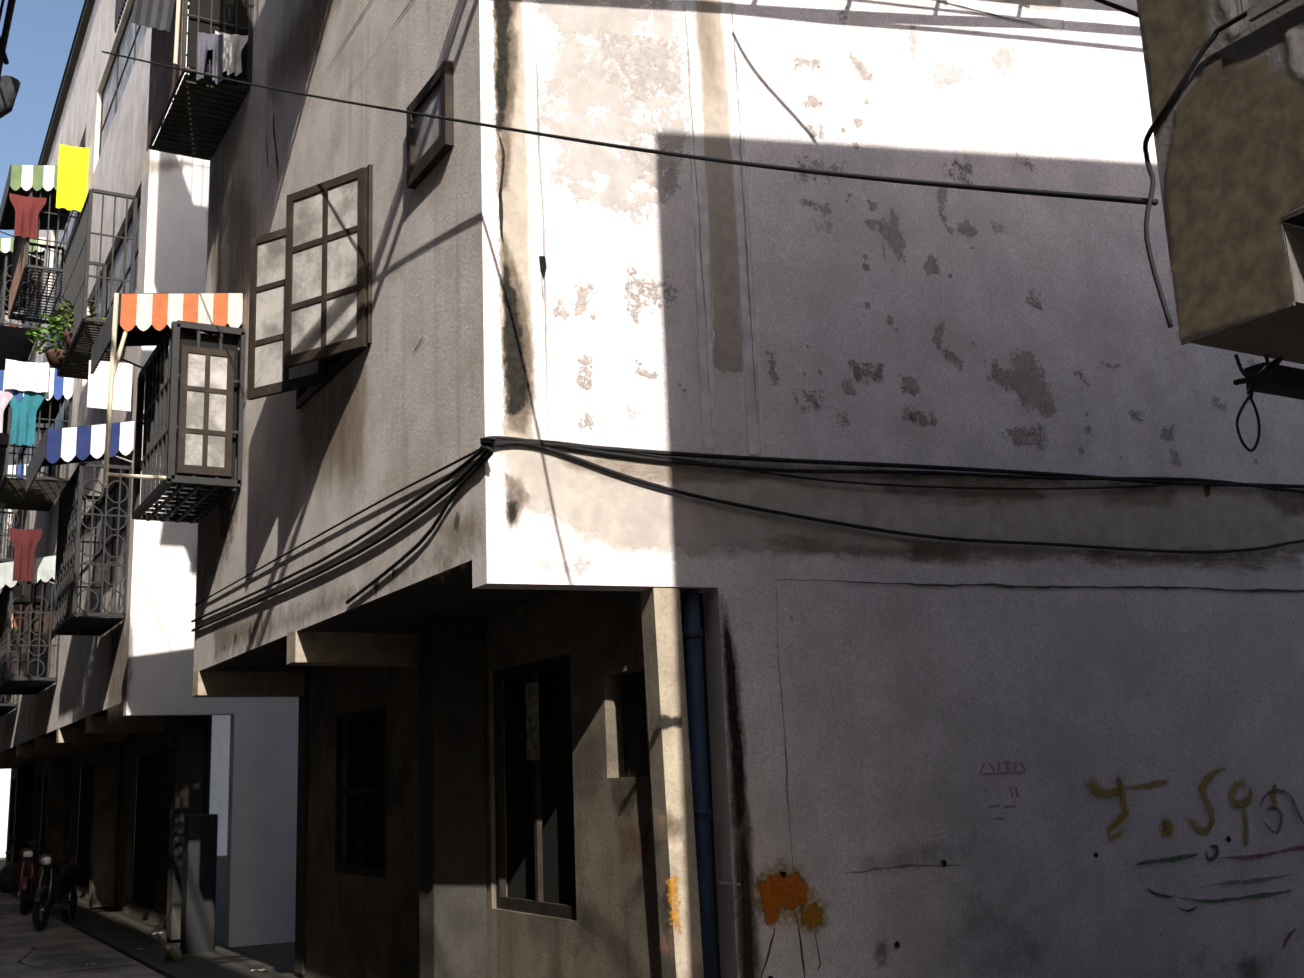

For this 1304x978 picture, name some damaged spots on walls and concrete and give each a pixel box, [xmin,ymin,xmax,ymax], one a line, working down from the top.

peeling [789,52,820,70]
peeling [849,52,873,80]
leakage [494,0,534,432]
peeling [492,0,690,439]
peeling [793,94,906,262]
peeling [938,159,977,250]
peeling [924,253,952,278]
peeling [932,320,963,370]
peeling [841,359,937,427]
peeling [984,348,1059,451]
leakage [507,476,524,523]
leakage [724,627,759,978]